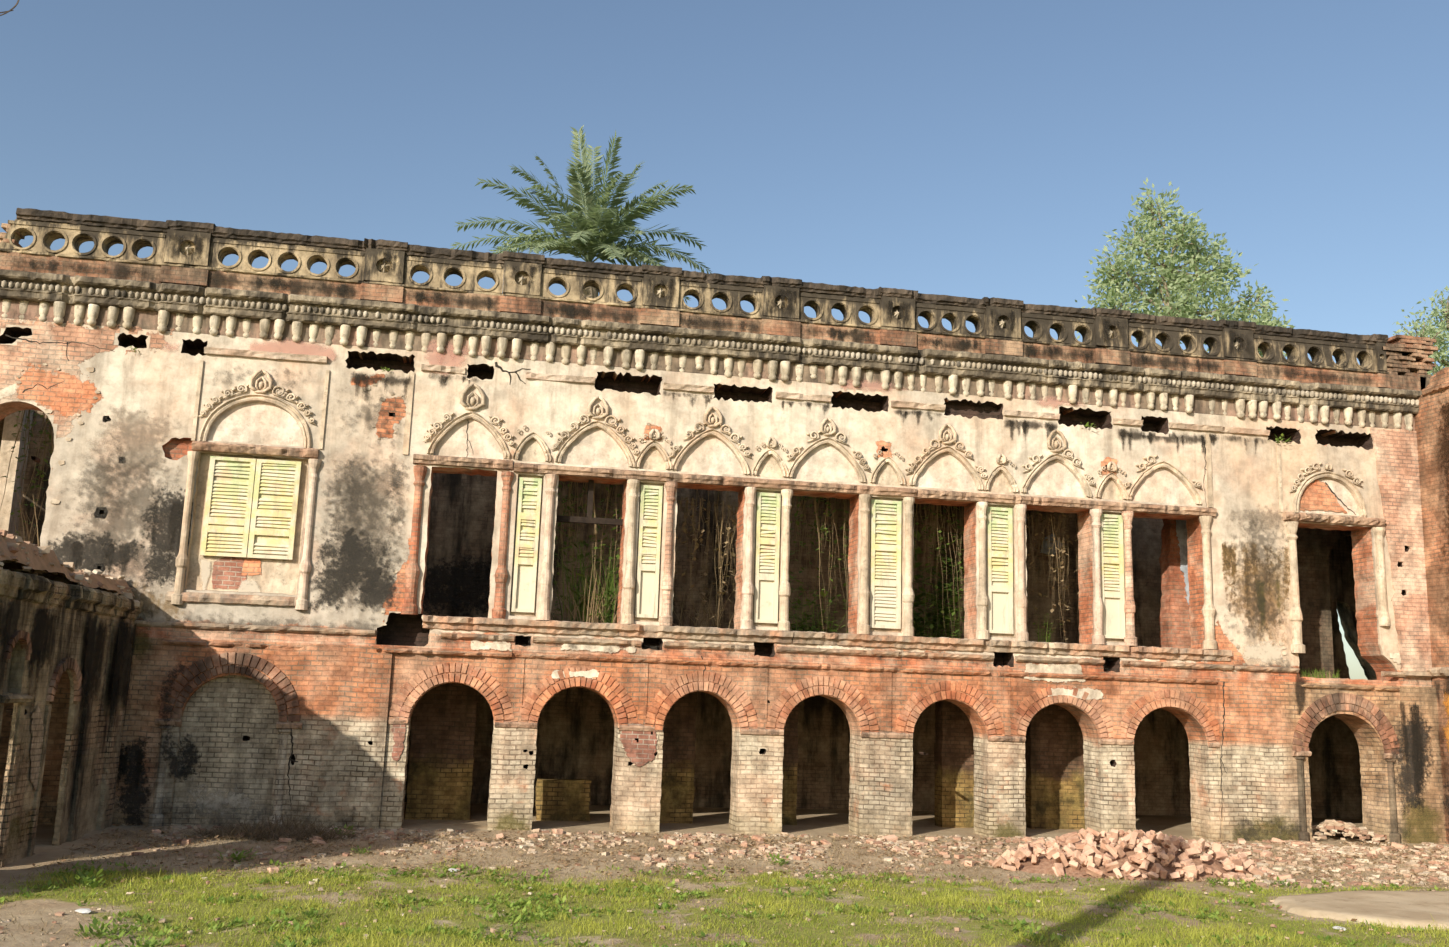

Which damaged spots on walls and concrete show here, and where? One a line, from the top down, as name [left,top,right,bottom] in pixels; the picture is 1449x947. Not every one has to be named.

flaking render [0,316,174,441]
spalling [163,438,192,460]
flaking render [351,374,406,440]
spalling [94,507,108,519]
damp [47,487,211,590]
flaking render [212,557,247,589]
damp [238,580,260,592]
damp [309,525,396,611]
damp [30,612,56,705]
damp [79,617,136,733]
spalling [620,723,657,767]
damp [1392,701,1449,844]